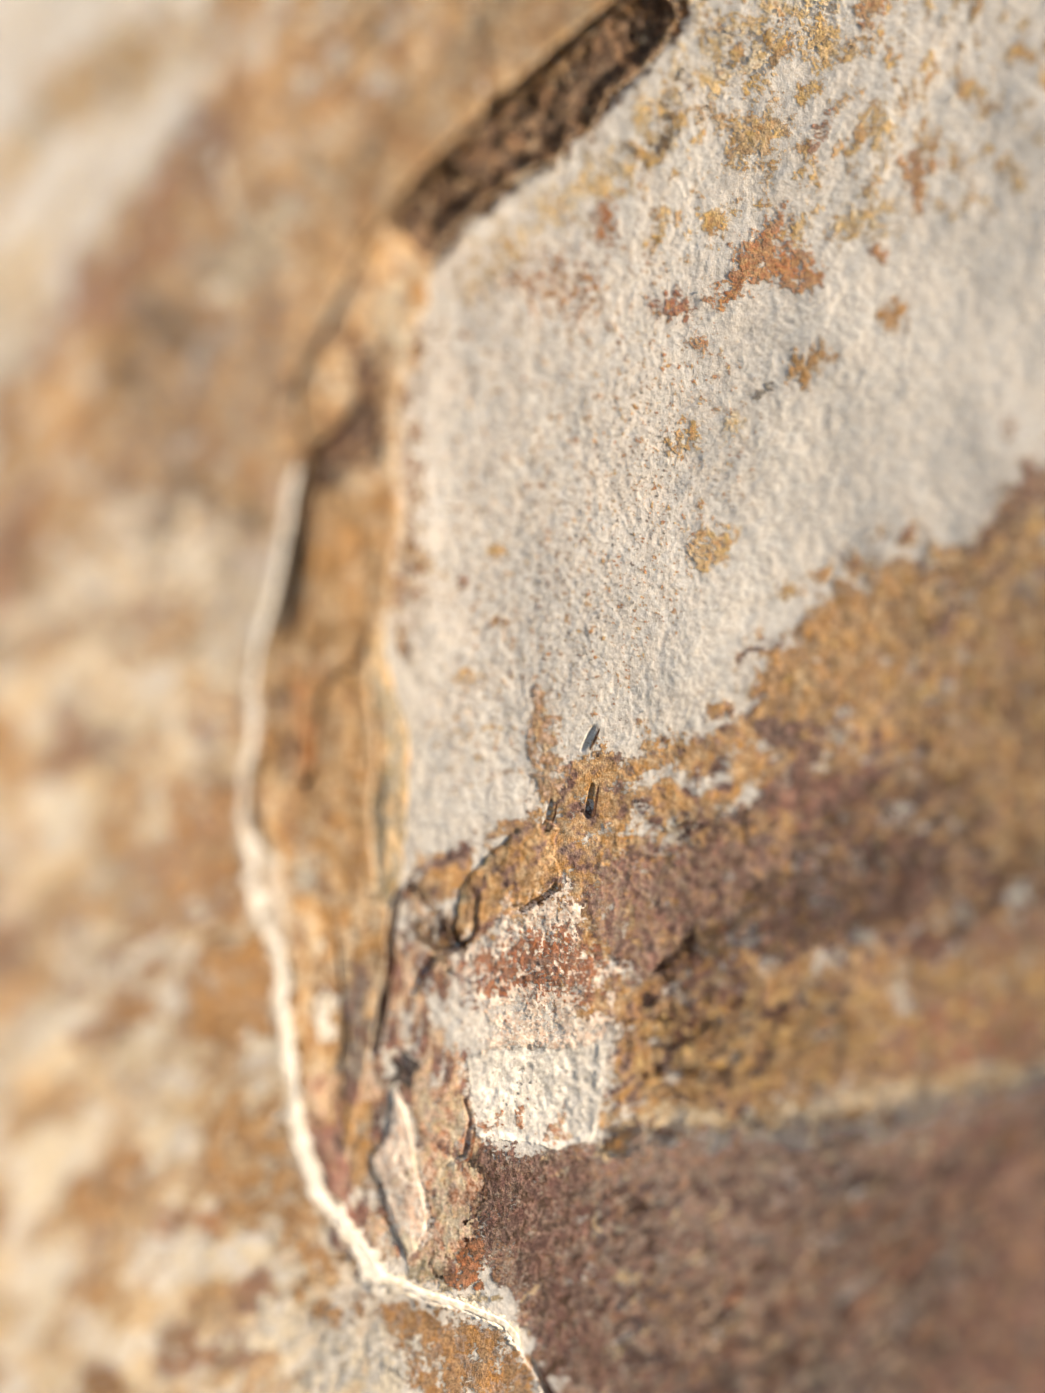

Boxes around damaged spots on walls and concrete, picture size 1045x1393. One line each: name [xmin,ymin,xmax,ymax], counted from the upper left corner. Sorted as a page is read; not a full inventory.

crack [238,458,561,1393]
crack [543,785,599,832]